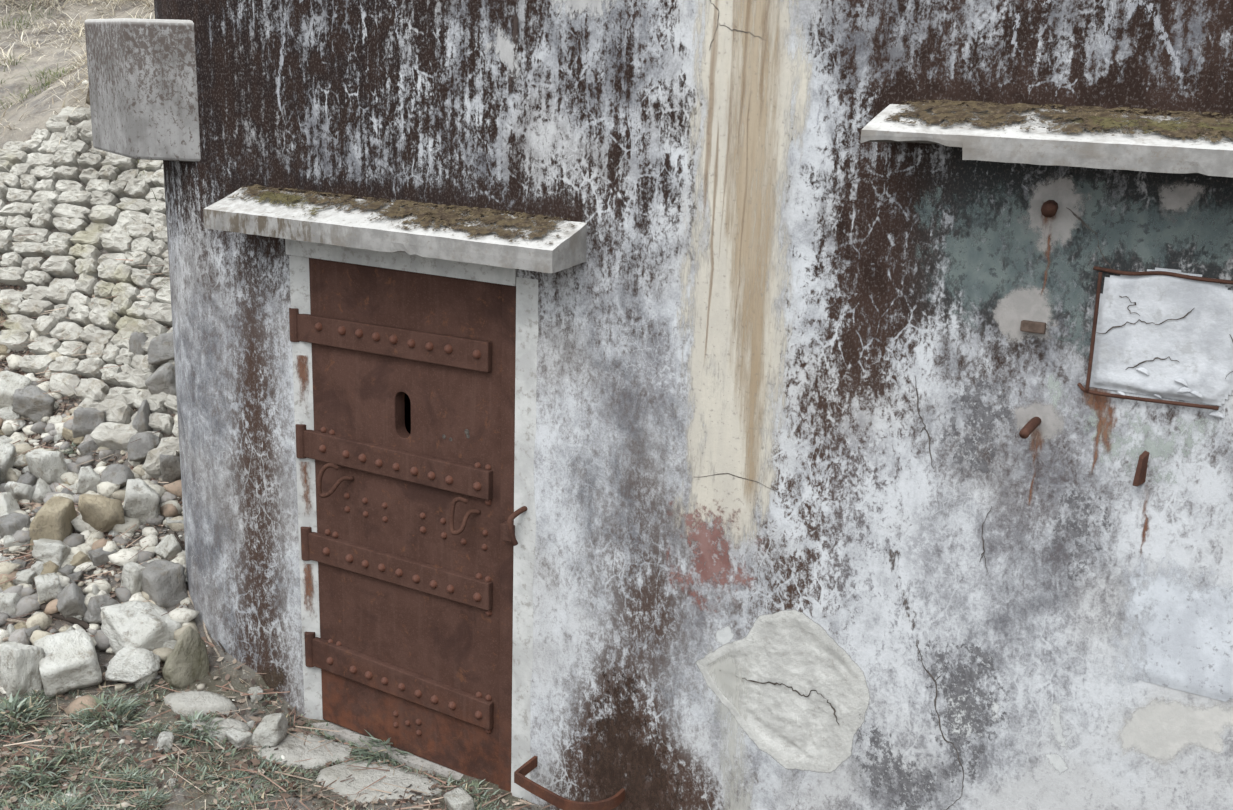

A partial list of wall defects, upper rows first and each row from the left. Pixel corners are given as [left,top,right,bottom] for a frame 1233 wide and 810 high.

damp [276,13,286,111]
damp [508,15,520,94]
crack [709,0,766,50]
damp [1102,0,1112,65]
damp [1126,0,1186,89]
rust [296,355,308,392]
rust [1083,388,1117,471]
rust [300,462,311,508]
rust [1029,430,1044,504]
rust [304,564,313,609]
crack [916,643,964,810]